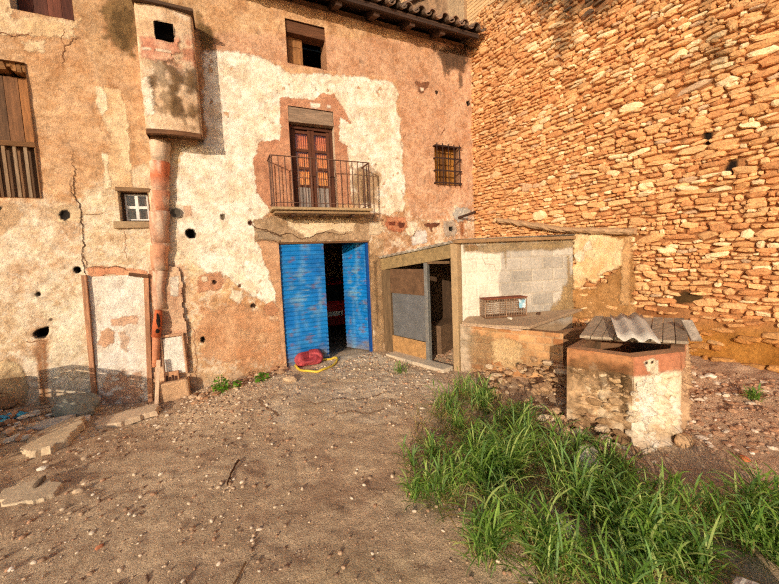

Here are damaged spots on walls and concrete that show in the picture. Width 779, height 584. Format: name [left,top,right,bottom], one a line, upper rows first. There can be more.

water stain [99,0,137,57]
water stain [197,12,214,50]
water stain [163,63,198,117]
water stain [433,45,468,87]
crack [69,147,105,291]
peeling [174,50,440,371]
peeling [572,234,632,289]